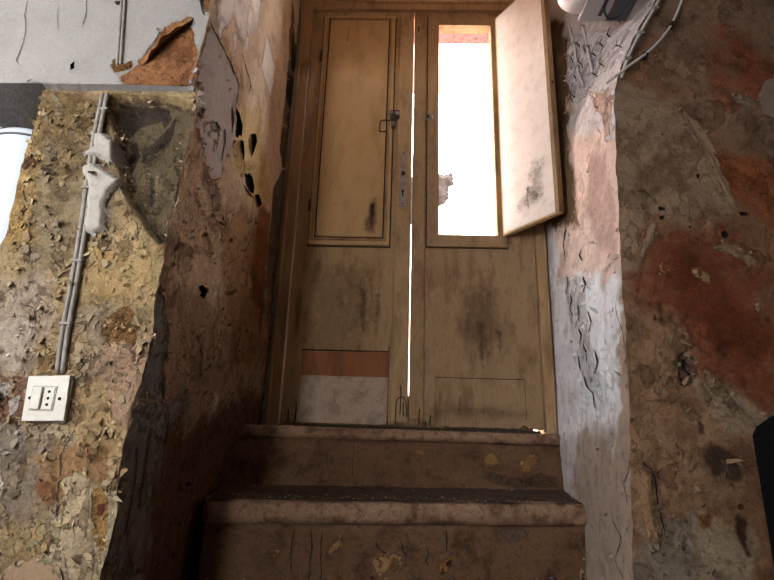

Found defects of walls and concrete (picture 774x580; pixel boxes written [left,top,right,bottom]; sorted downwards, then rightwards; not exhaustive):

peeling [730,74,774,118]
flaking render [0,0,253,580]
peeling [564,271,604,407]
peeling [675,347,771,431]